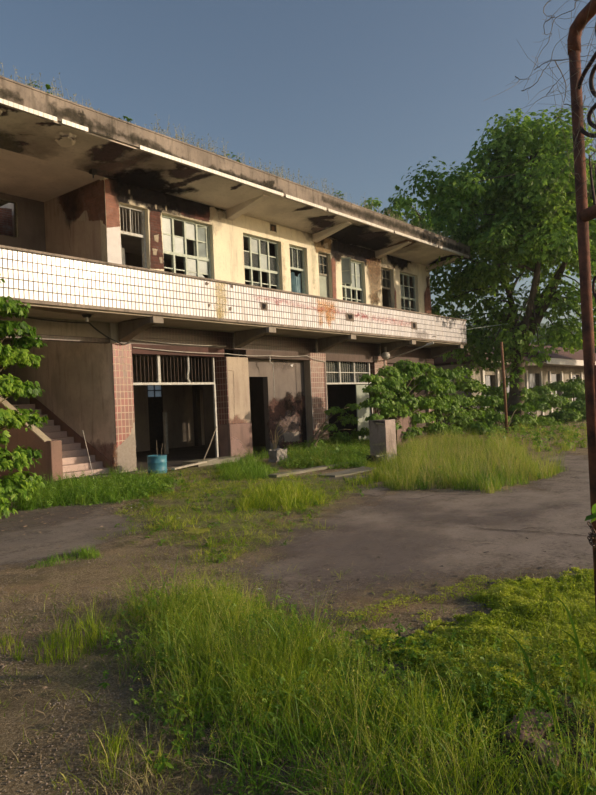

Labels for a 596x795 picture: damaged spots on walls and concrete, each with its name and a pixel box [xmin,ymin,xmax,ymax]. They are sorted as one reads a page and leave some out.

leakage [0,133,23,153]
spalling [59,142,152,228]
spalling [180,207,224,222]
leakage [322,197,468,265]